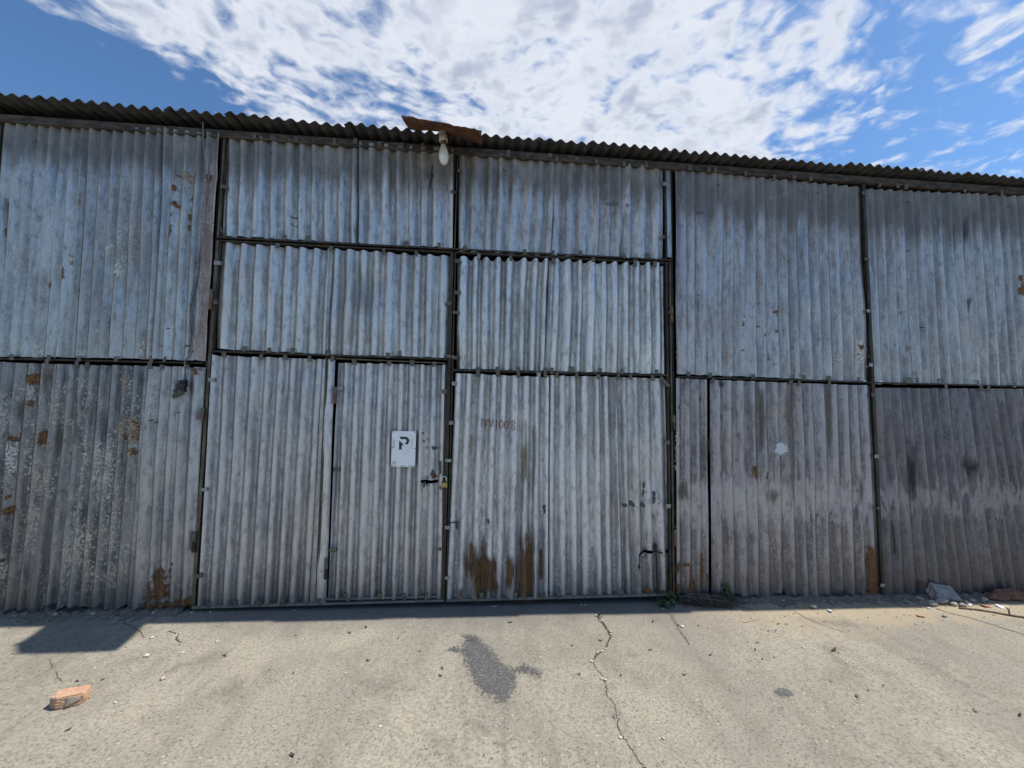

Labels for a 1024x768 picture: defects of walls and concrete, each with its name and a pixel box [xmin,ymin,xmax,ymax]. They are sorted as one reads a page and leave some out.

rust [26,373,52,385]
rust [36,430,48,450]
rust [138,563,192,610]
rust [459,538,543,603]
rust [832,546,886,597]
crack [581,604,646,768]